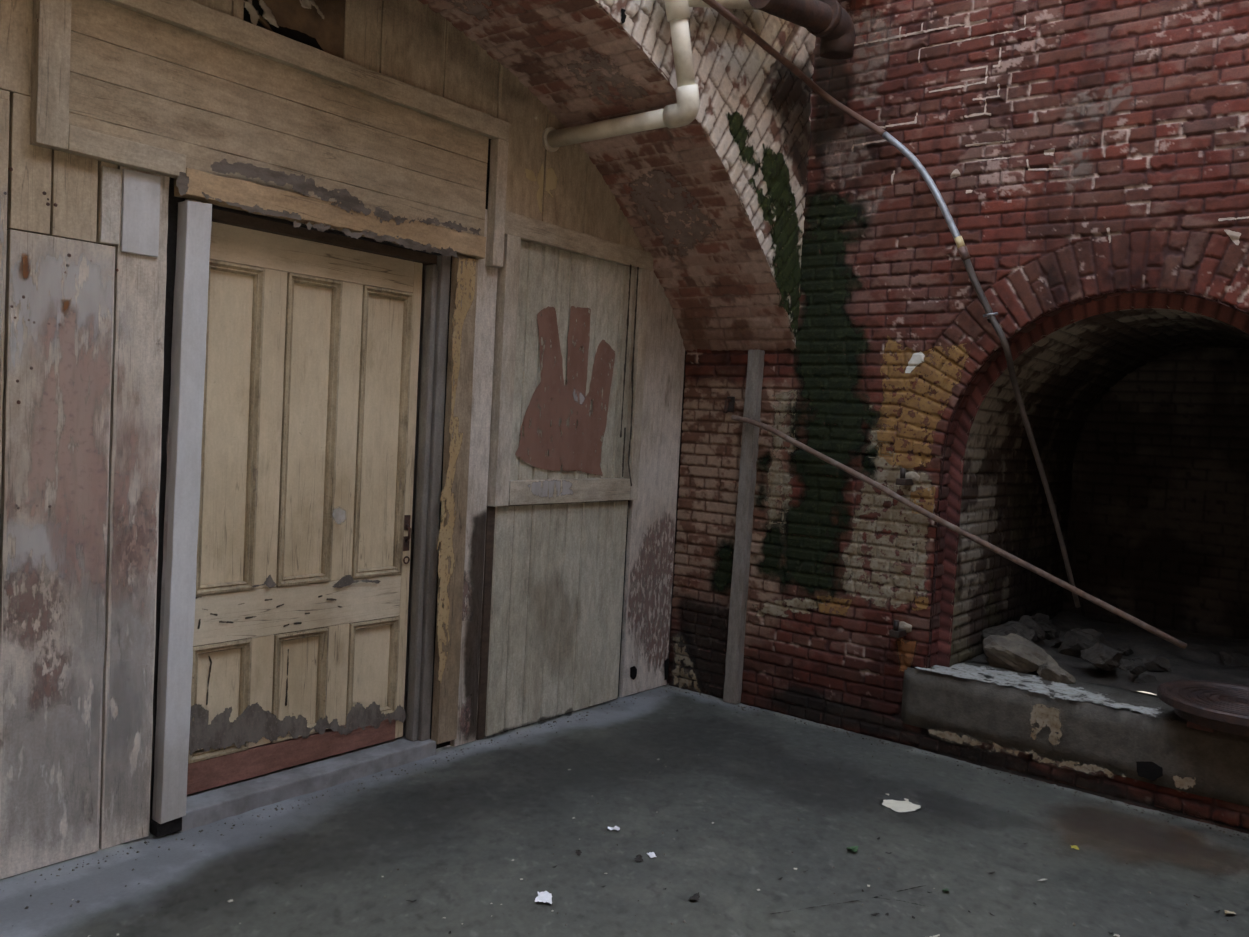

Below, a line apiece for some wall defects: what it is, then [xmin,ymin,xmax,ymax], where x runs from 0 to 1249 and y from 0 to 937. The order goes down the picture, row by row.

peeling [176,159,481,424]
peeling [3,557,69,709]
peeling [189,701,406,755]